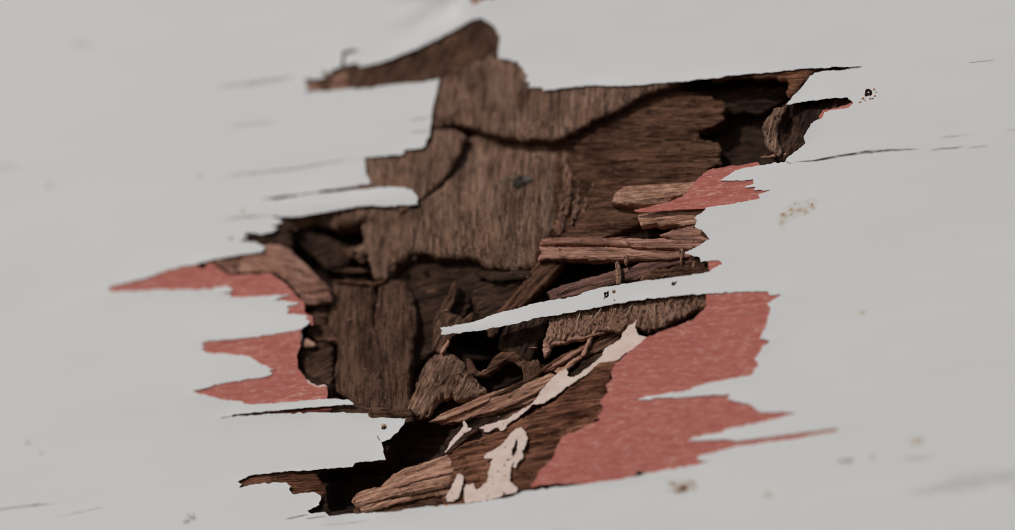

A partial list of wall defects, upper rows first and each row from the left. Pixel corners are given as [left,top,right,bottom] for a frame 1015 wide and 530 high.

peeling [633,162,770,213]
peeling [108,262,333,417]
peeling [530,291,838,487]